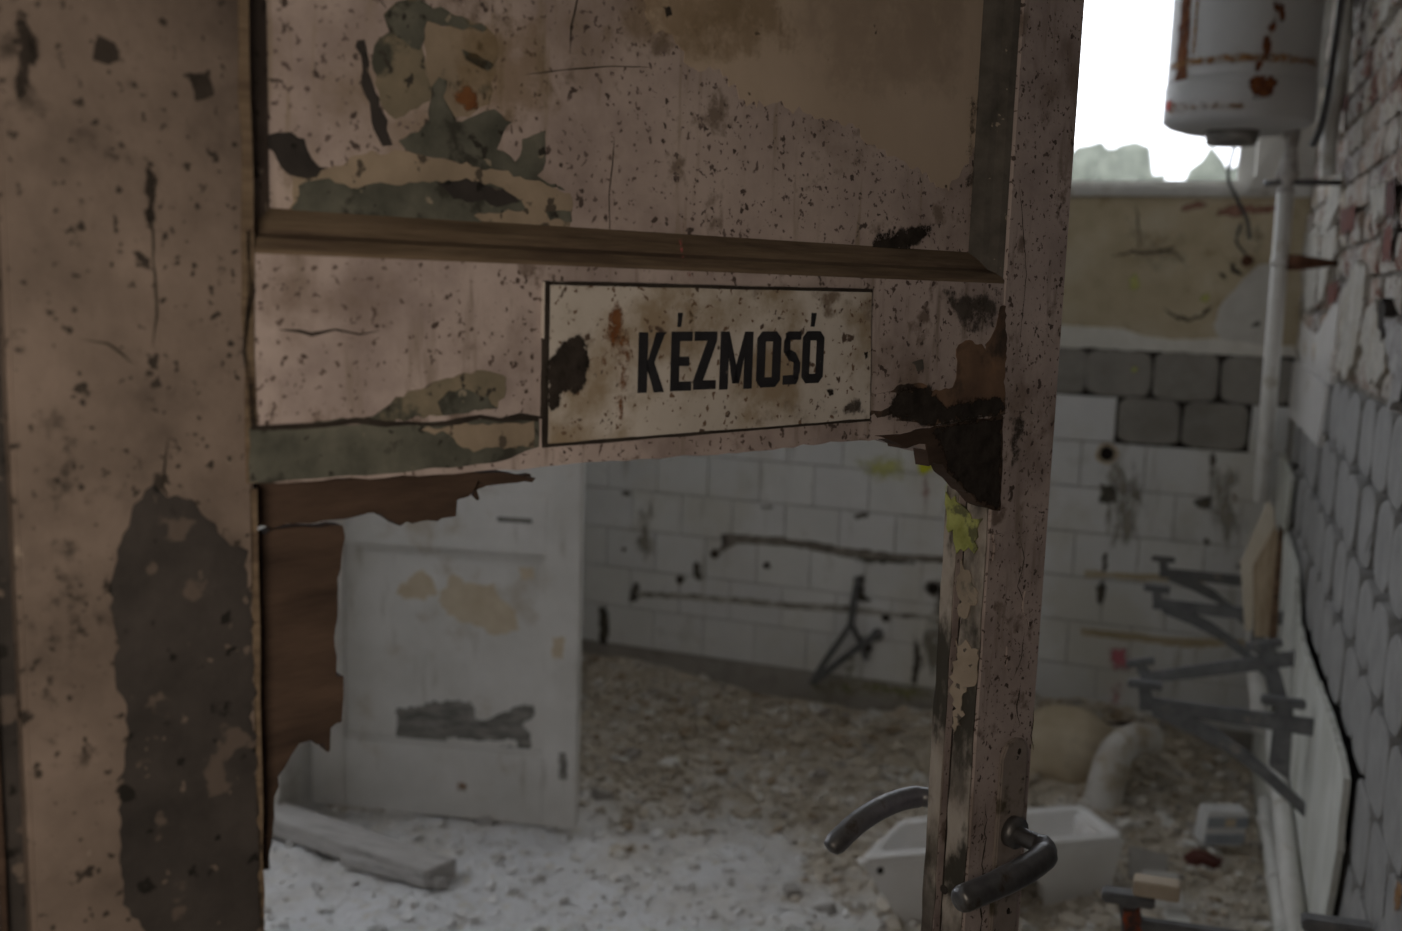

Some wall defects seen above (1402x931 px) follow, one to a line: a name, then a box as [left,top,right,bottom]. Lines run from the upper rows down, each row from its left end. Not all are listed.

peeling [396,570,519,635]
peeling [109,485,265,931]
peeling [395,700,535,749]
peeling [949,639,979,734]